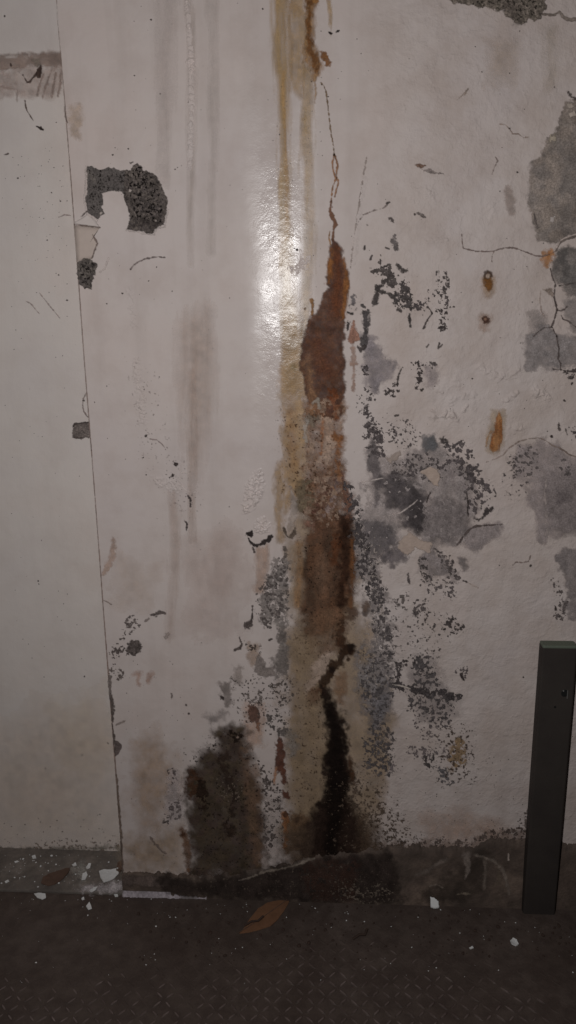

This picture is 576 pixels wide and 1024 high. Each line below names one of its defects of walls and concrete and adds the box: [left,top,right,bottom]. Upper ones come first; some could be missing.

spalling [451,0,547,32]
spalling [59,147,176,289]
crack [321,83,394,268]
corrosion [483,271,493,291]
crack [461,234,576,372]
spalling [516,91,576,385]
corrosion [273,0,423,863]
corrosion [486,410,505,452]
peeling [343,234,576,831]
damp [27,724,527,905]